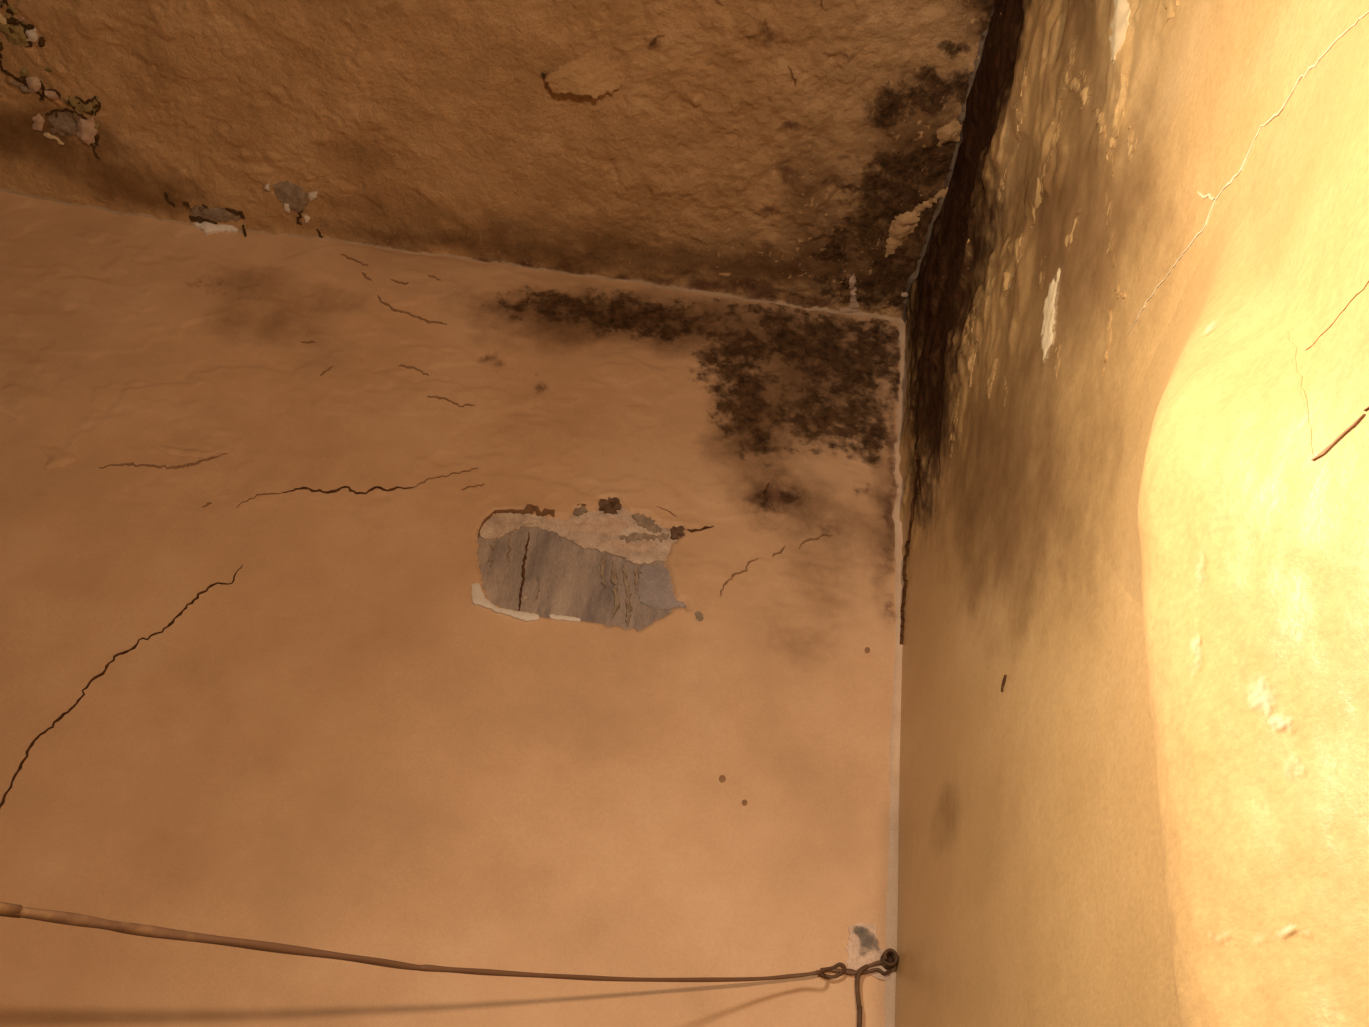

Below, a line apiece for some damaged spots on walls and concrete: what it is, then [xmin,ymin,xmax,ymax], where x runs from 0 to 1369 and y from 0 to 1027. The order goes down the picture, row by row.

peeling [0,0,101,160]
leakage [497,0,1056,573]
peeling [885,187,948,258]
peeling [1037,261,1061,378]
peeling [1003,0,1137,297]
leakage [1025,141,1139,320]
crack [1127,11,1369,335]
crack [1287,280,1369,461]
crack [202,468,484,508]
spalling [471,497,714,632]
crack [720,533,833,596]
crack [0,565,243,809]